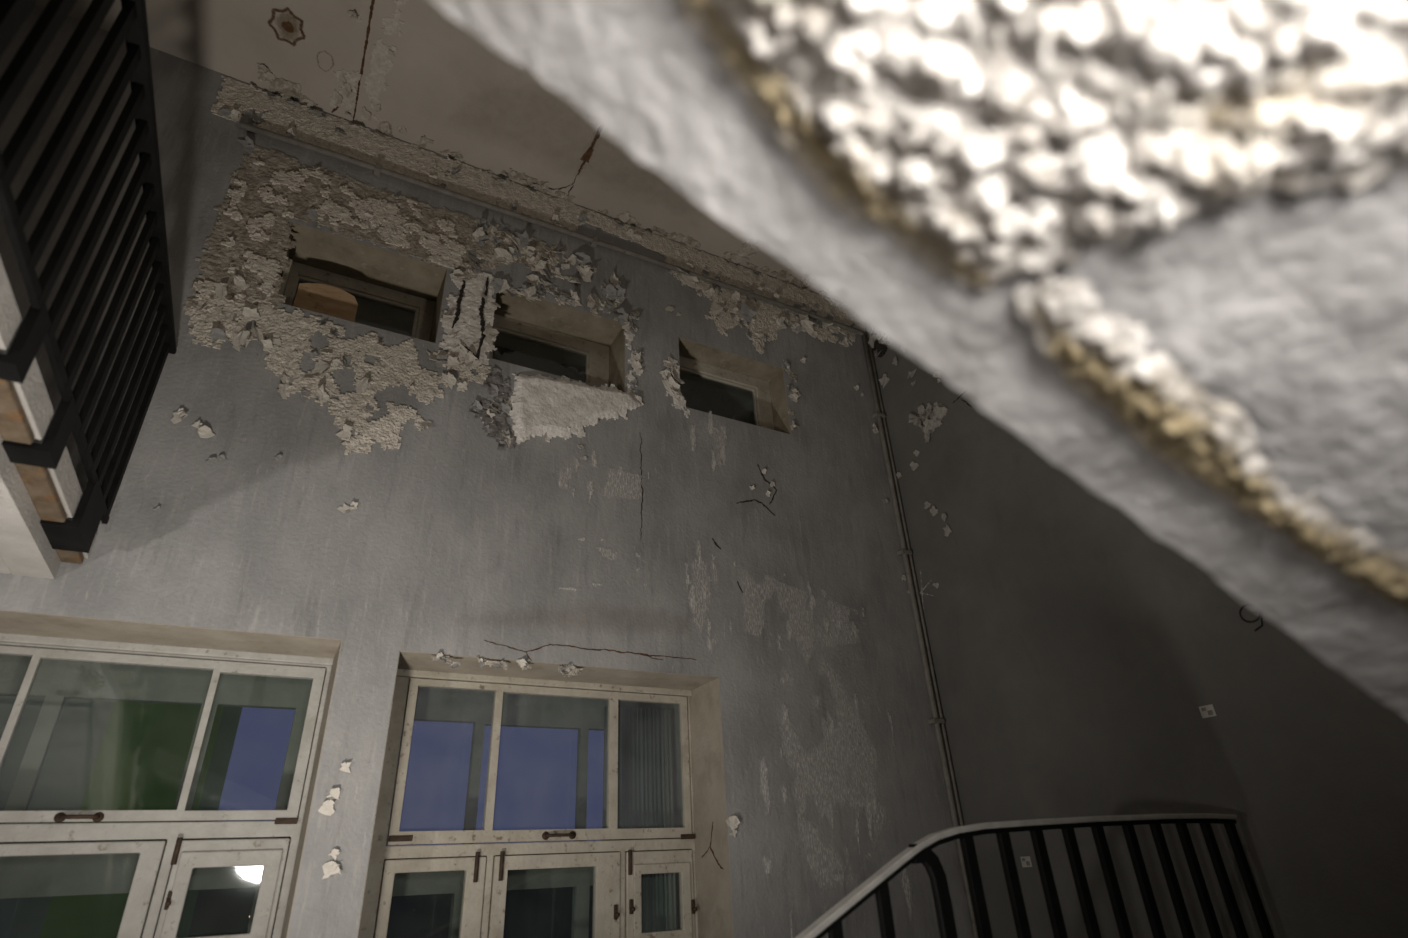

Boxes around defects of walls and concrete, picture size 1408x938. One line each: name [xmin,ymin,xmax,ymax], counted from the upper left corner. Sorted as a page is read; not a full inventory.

crack [332,0,375,121]
crack [532,128,600,195]
peeling [183,63,917,455]
spalling [708,0,1408,569]
peeling [171,408,215,438]
crack [736,464,777,515]
crack [484,640,696,661]
peeling [318,788,340,816]
peeling [322,849,341,879]